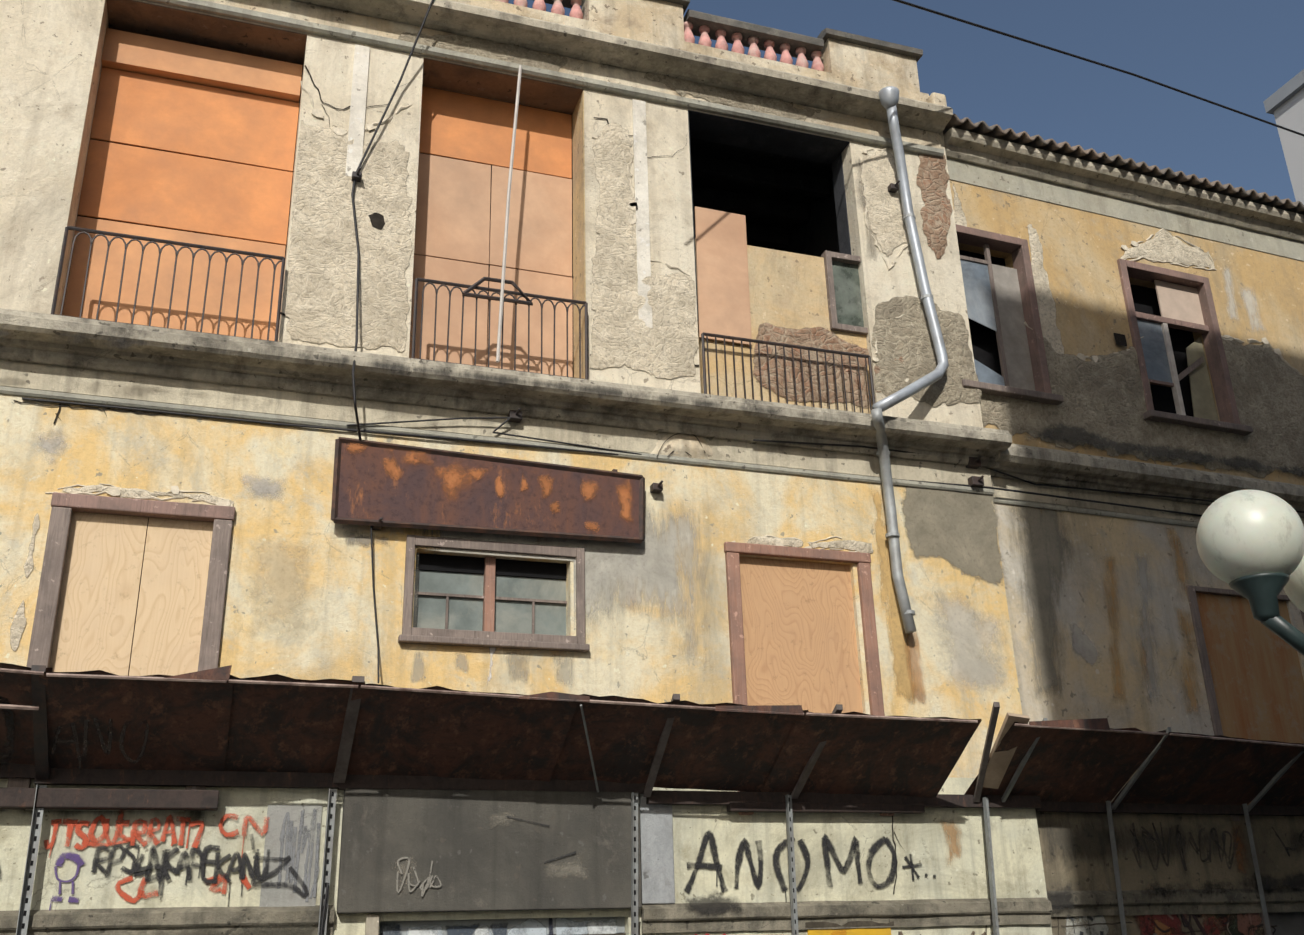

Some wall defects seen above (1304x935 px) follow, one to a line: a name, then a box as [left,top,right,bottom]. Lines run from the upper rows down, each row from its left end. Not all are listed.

spalling [861,147,967,270]
spalling [753,224,1304,478]
corrosion [384,452,425,480]
corrosion [438,466,504,497]
corrosion [521,476,559,512]
corrosion [582,482,597,499]
corrosion [618,484,631,520]